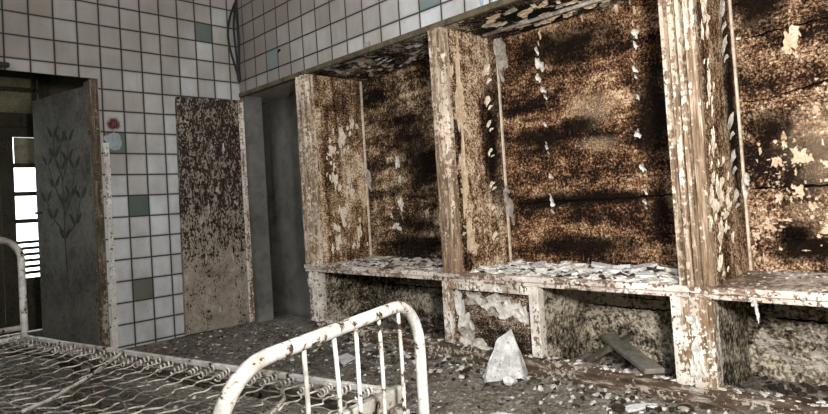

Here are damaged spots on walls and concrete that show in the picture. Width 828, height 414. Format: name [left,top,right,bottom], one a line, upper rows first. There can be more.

peeling [326,118,369,254]
peeling [450,34,478,257]
peeling [481,0,619,100]
leakage [518,118,593,153]
leakage [518,22,614,68]
leakage [534,236,637,255]
leakage [521,182,673,231]
leakage [635,39,669,165]
peeling [704,59,750,276]
crack [740,79,828,102]
peeling [751,131,828,257]
spalling [781,25,801,58]